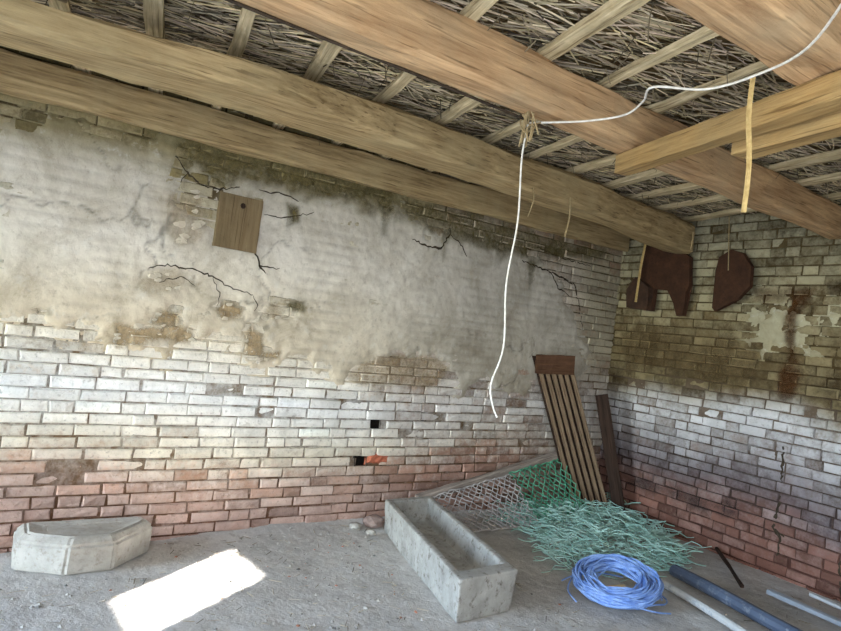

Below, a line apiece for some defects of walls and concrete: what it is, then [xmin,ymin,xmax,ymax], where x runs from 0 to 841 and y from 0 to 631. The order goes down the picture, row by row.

flaking render [173,209,205,244]
crack [254,254,279,274]
crack [149,263,258,311]
flaking render [218,302,241,321]
flaking render [263,301,304,319]
flaking render [113,312,196,347]
flaking render [243,328,279,362]